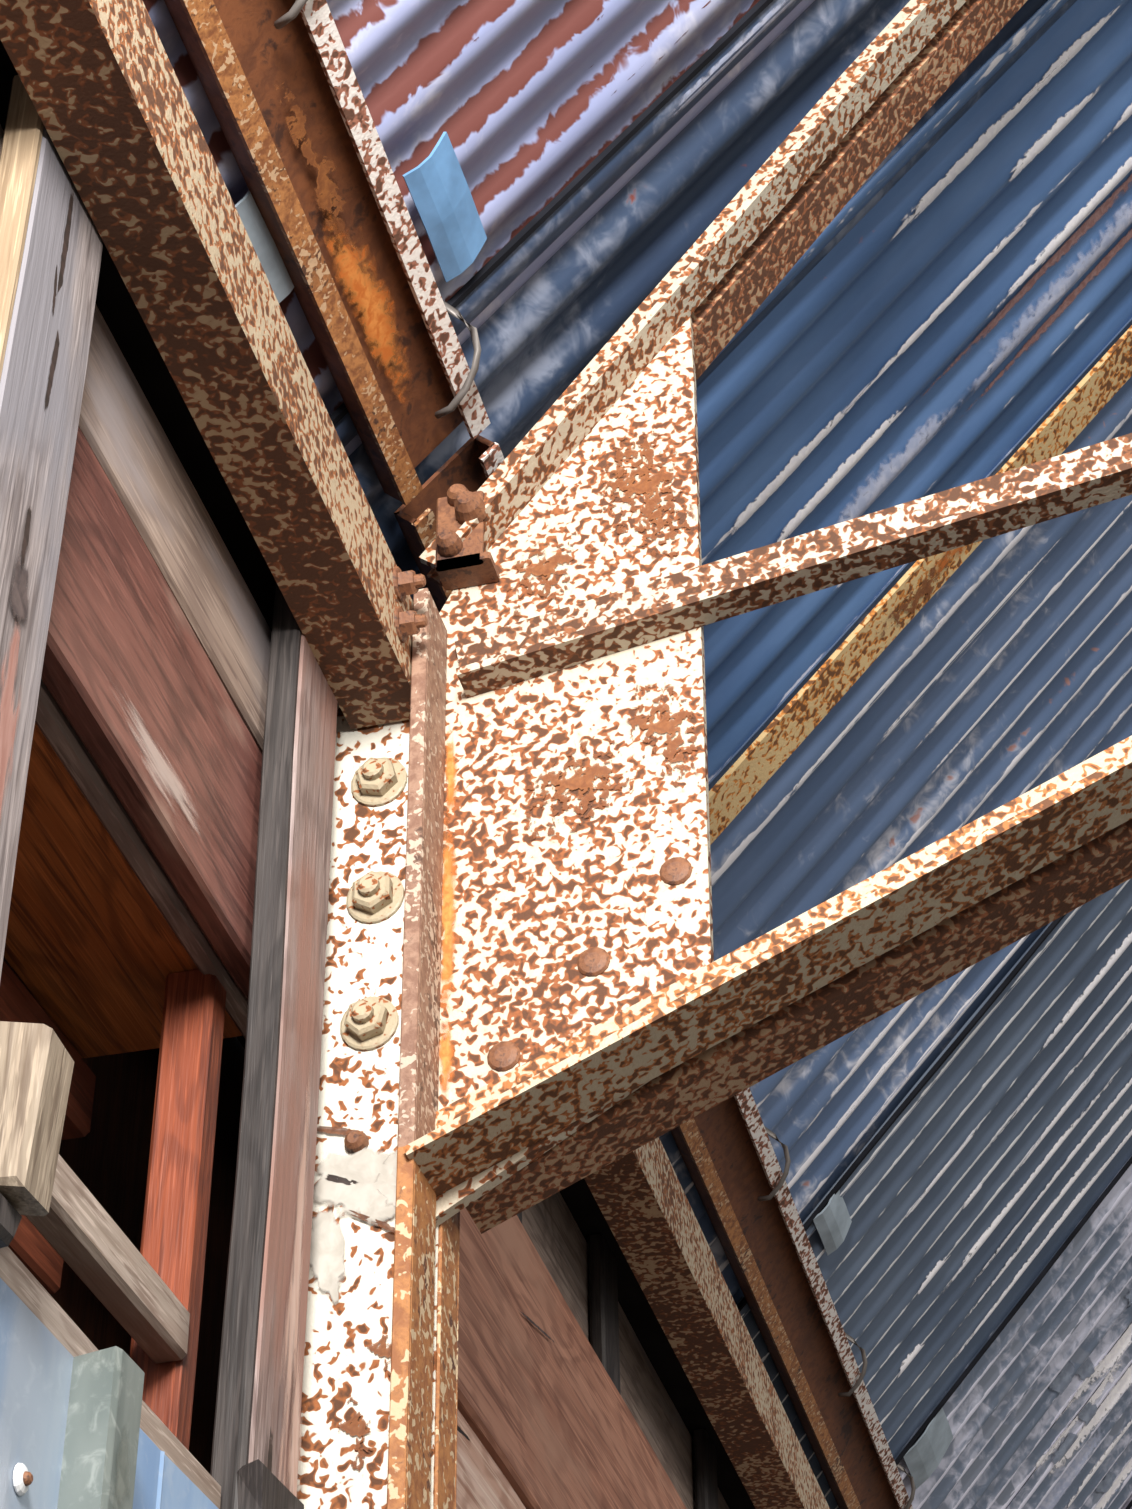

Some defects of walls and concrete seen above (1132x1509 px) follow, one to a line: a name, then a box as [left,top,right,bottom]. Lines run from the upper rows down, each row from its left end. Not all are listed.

rust [275,83,407,399]
rust [599,428,694,559]
rust [497,531,579,615]
rust [878,547,963,637]
rust [445,733,457,814]
rust [526,684,698,840]
rust [440,834,456,1004]
rust [439,1024,454,1091]
peeling [280,1105,397,1497]
rust [367,1334,391,1376]
rust [337,1397,373,1471]